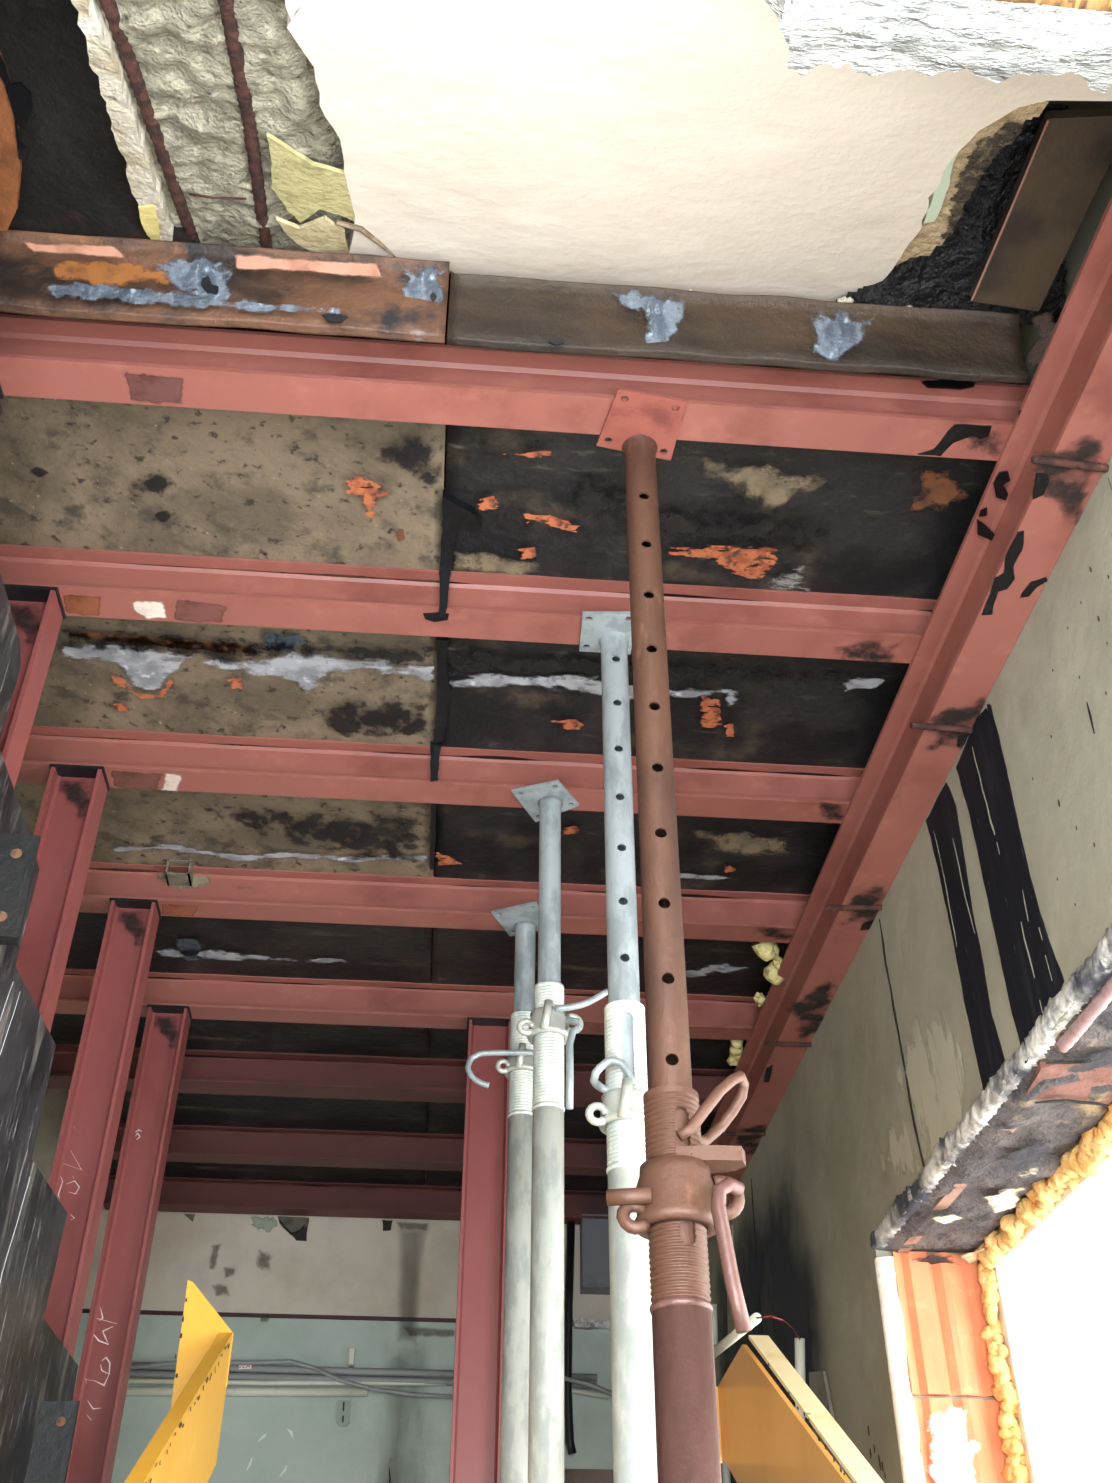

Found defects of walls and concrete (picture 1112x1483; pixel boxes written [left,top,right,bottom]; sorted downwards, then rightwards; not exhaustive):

spalling [88,0,396,257]
spalling [895,101,1049,266]
rust [54,260,171,286]
rust [911,471,966,510]